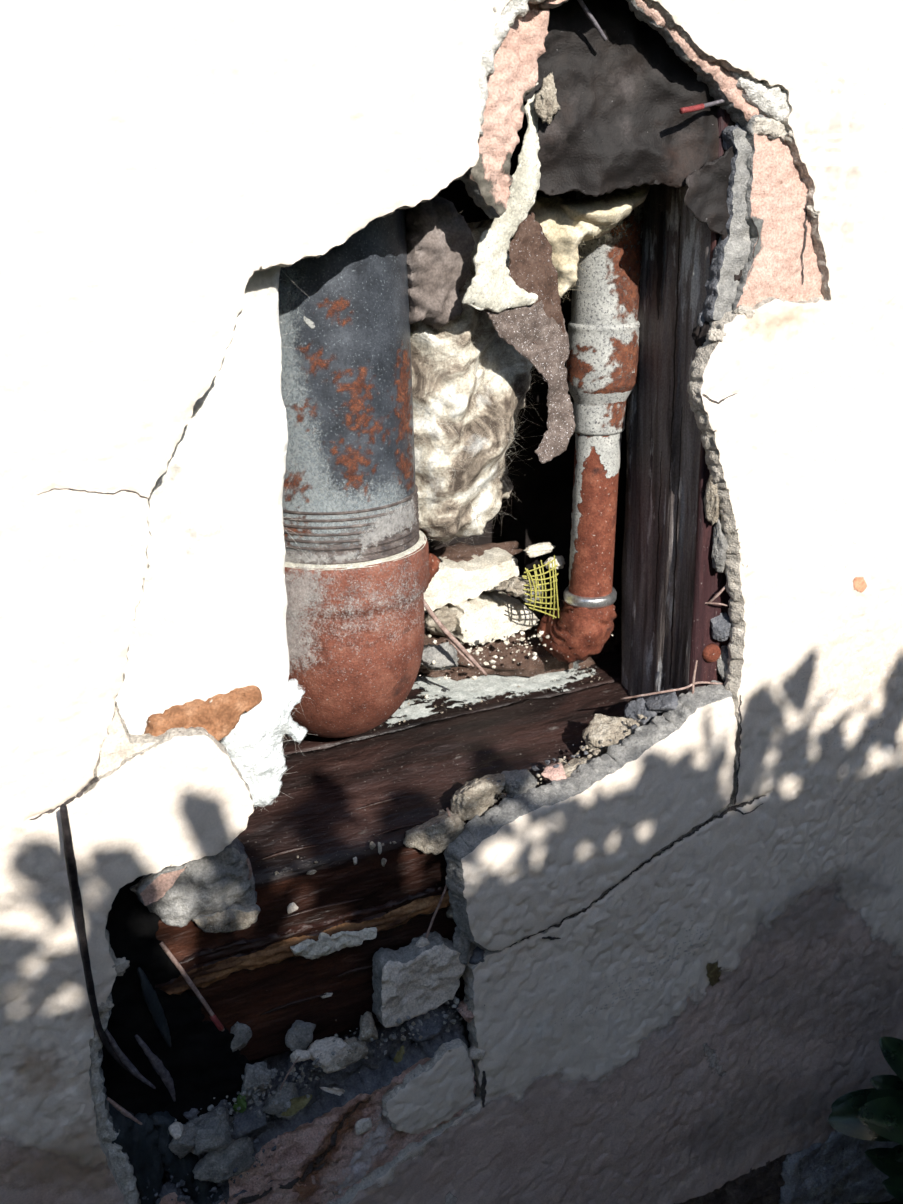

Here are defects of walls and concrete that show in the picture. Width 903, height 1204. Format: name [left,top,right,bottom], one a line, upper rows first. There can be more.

rust [319,298,352,325]
rust [566,207,644,430]
crack [38,488,148,499]
rust [283,472,312,545]
rust [294,400,316,431]
rust [301,344,414,500]
spalling [215,0,831,1204]
spalling [83,727,254,810]
crack [509,695,766,947]
spalling [89,915,141,1204]